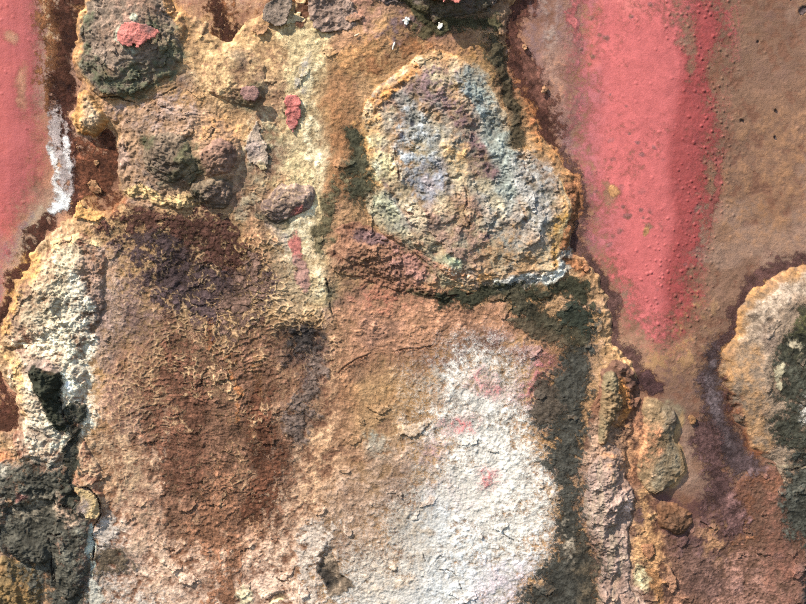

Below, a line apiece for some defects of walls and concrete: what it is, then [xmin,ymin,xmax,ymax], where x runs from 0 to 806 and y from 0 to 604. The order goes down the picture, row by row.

peeling [117,21,160,48]
hole [251,0,358,35]
peeling [240,85,260,102]
peeling [284,94,301,132]
efflorescence [46,104,74,215]
spalling [265,317,331,446]
damp [774,362,786,391]
rust [0,342,42,471]
damp [56,400,88,513]
damp [293,283,596,604]
rust [32,563,66,604]
spalling [316,552,355,597]